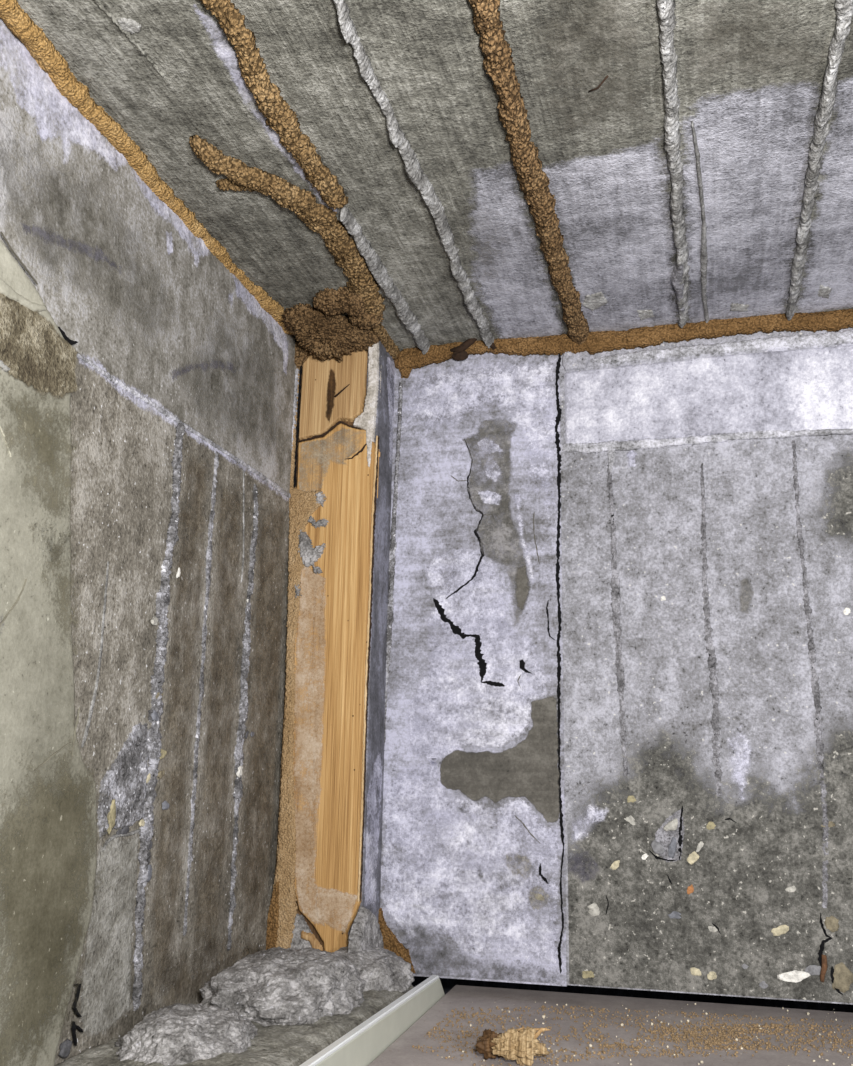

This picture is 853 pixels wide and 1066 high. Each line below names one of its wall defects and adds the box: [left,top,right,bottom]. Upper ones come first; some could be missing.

spalling [0,278,78,398]
leakage [466,164,562,339]
leakage [541,0,853,332]
crack [433,438,521,688]
crack [515,354,565,974]
leakage [0,753,107,1066]
spalling [649,806,685,862]